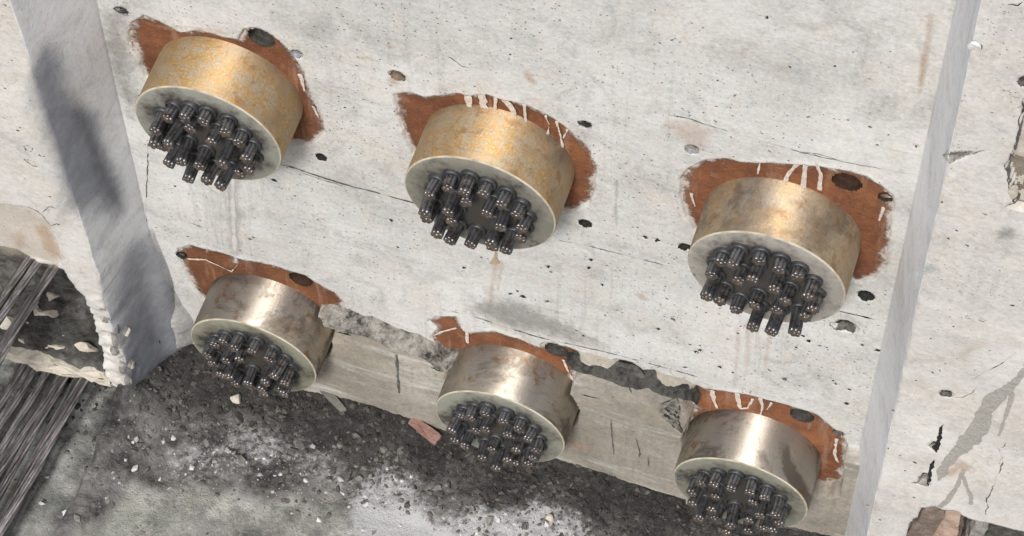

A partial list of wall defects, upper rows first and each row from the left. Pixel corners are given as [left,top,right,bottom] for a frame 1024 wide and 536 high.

peeling [1004,100,1024,207]
crack [927,425,943,486]